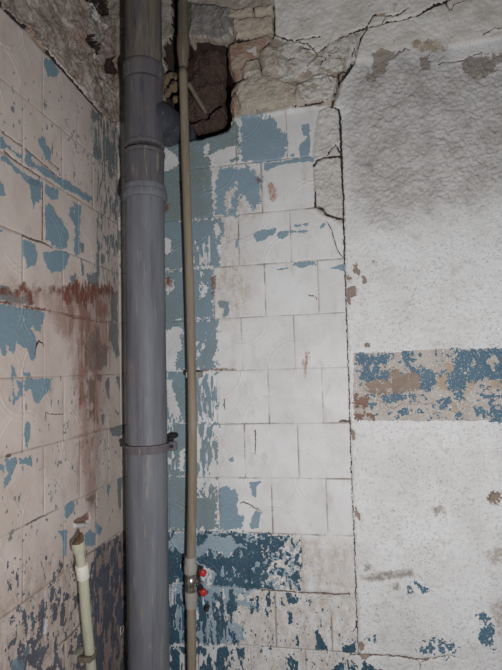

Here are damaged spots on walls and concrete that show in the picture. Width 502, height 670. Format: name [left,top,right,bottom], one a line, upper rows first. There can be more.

hole [163,0,180,114]
spalling [461,52,502,80]
rust [0,282,51,312]
peeling [0,95,124,453]
rust [51,279,114,351]
peeling [164,143,188,670]
spalling [187,5,382,670]
crack [232,0,468,670]
peeling [352,343,502,424]
peeling [2,478,128,670]
peeling [415,636,460,661]
peeling [475,612,496,651]